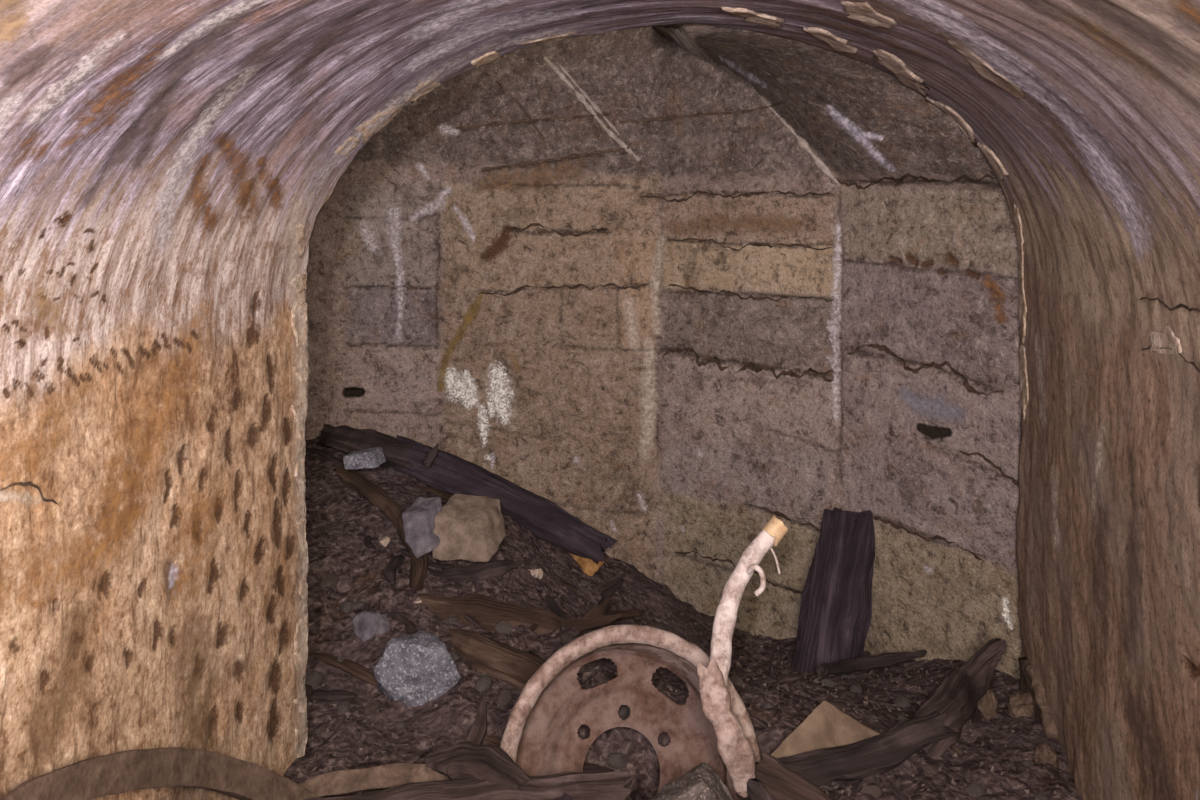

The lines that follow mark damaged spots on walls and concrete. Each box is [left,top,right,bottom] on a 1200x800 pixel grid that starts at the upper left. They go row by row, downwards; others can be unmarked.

flaking render [722,7,785,29]
flaking render [840,1,898,29]
flaking render [803,27,857,54]
rust [16,43,164,162]
flaking render [873,48,1009,180]
rust [188,135,281,231]
crack [510,223,609,237]
crack [1139,297,1200,312]
crack [662,343,1004,395]
crack [1141,346,1200,373]
crack [0,481,59,505]